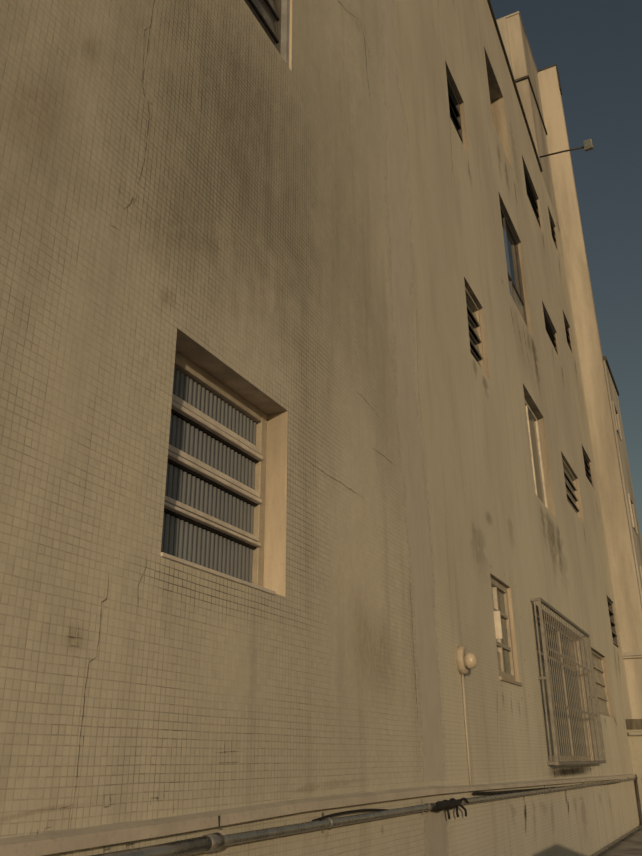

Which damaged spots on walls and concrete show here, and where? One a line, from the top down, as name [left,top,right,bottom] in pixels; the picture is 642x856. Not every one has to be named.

crack [110,0,155,229]
crack [60,558,112,829]